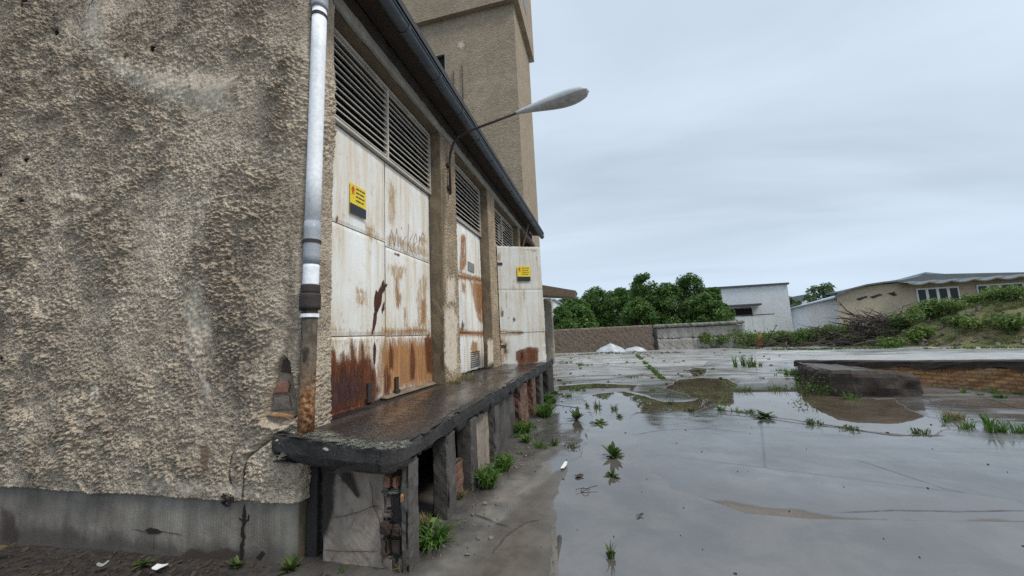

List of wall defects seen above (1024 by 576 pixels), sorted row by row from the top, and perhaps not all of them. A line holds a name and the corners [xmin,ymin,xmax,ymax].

corrosion [330,221,433,416]
corrosion [458,235,483,357]
corrosion [499,280,539,364]
spalling [267,358,298,426]